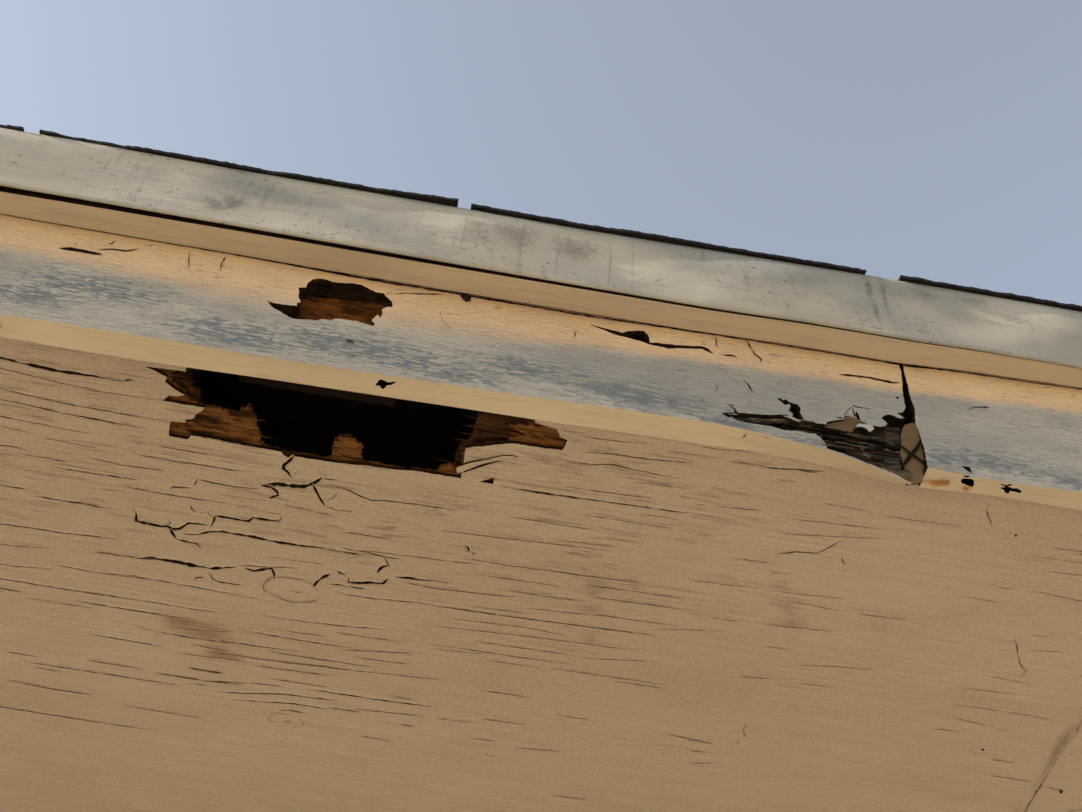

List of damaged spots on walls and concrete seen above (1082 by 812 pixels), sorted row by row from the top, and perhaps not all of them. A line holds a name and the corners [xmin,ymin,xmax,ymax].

crack [1,214,1078,391]
spalling [189,368,478,470]
peeling [799,416,874,446]
peeling [897,417,924,485]
crack [0,355,833,756]
crack [1035,549,1082,601]
crack [667,723,748,764]
crack [937,676,1082,812]